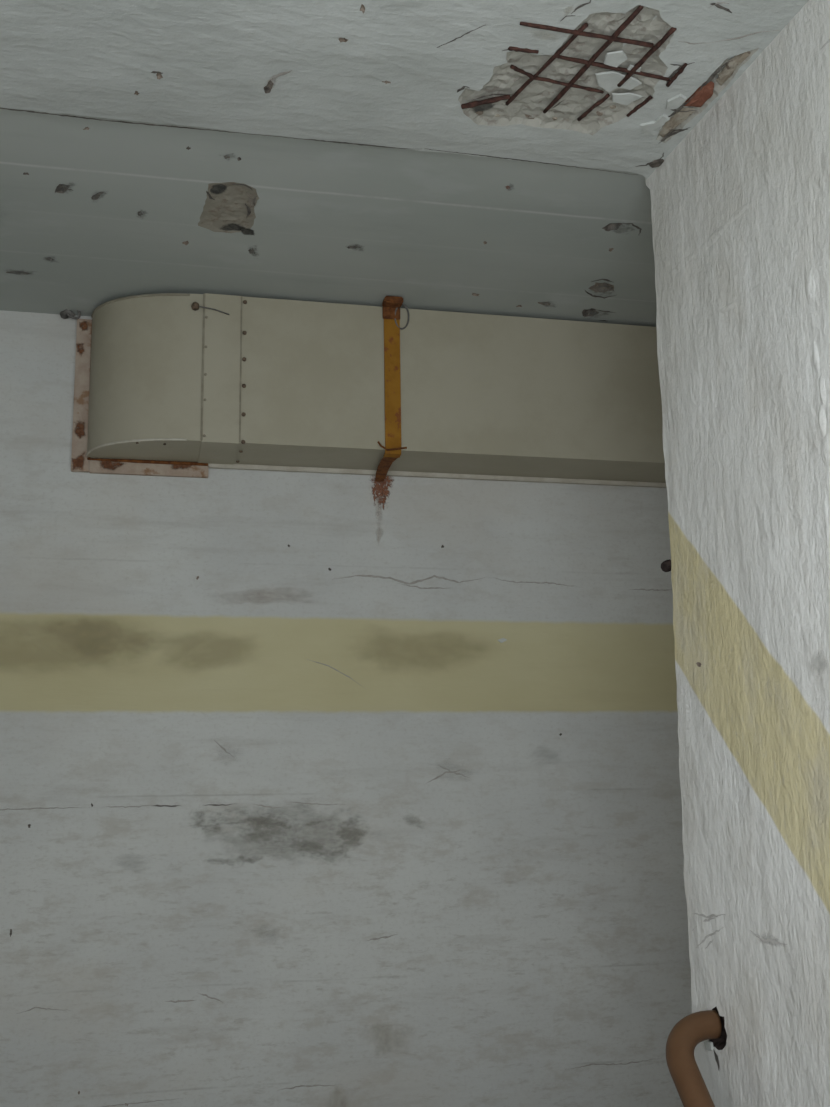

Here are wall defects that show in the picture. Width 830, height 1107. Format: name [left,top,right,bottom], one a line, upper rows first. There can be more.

spalling [457,0,759,168]
peeling [198,182,259,235]
rust [75,422,85,438]
rust [72,453,84,470]
rust [100,461,124,470]
rust [371,475,394,509]
crack [332,575,577,589]